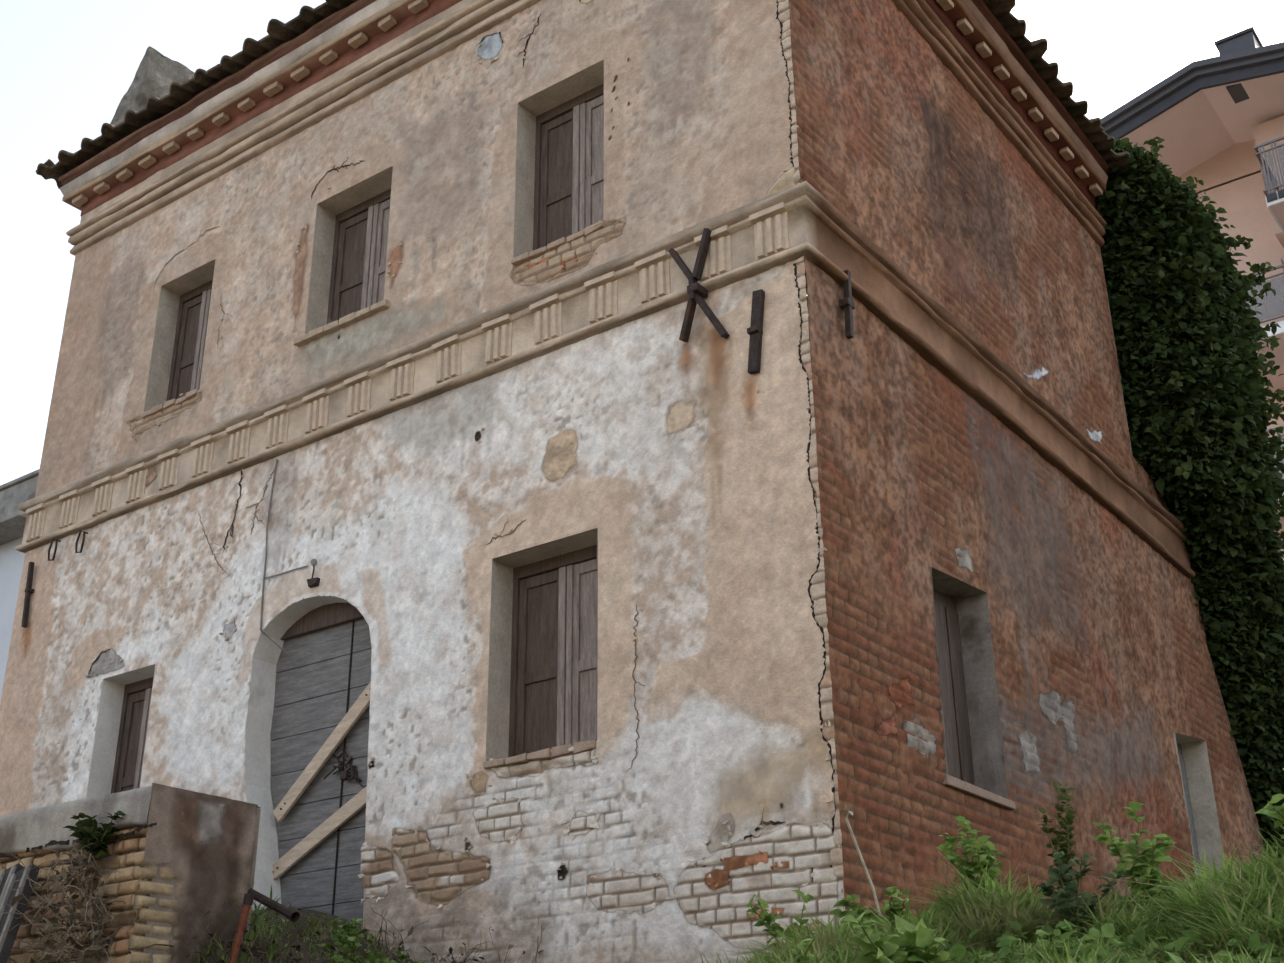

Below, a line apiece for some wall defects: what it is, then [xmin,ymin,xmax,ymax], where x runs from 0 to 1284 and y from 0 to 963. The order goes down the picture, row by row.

flaking render [478,30,503,64]
crack [311,158,362,200]
spalling [508,220,625,286]
crack [198,462,278,576]
flaking render [85,649,125,678]
crack [627,601,644,771]
spalling [586,260,844,953]
spalling [358,746,601,909]